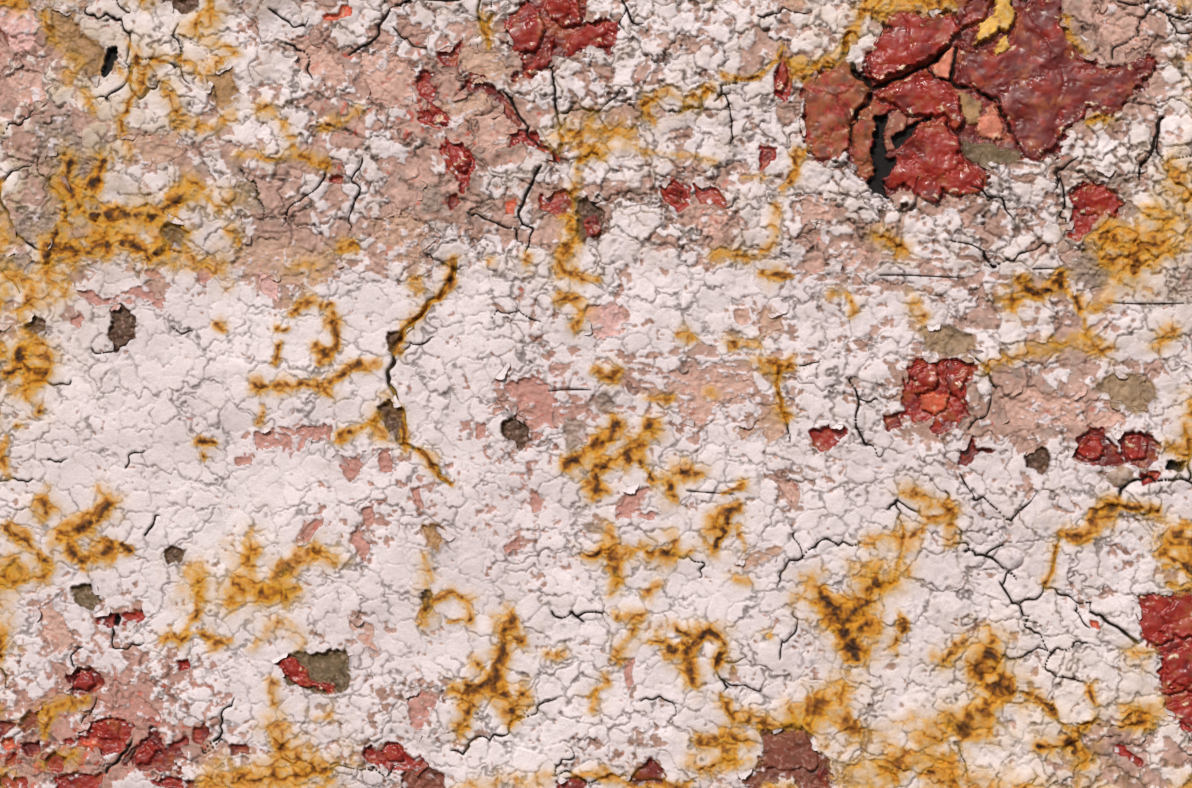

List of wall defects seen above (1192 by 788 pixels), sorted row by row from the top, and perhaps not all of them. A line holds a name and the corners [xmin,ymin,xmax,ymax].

crack [84,0,188,100]
peeling [291,0,620,263]
crack [471,67,624,254]
crack [843,18,1018,146]
peeling [774,0,1160,205]
corrosion [0,153,232,416]
corrosion [0,485,135,590]
corrosion [559,413,705,503]
corrosion [797,487,959,667]
peeling [883,323,996,466]
crack [946,475,1142,682]
peeling [1131,588,1192,733]